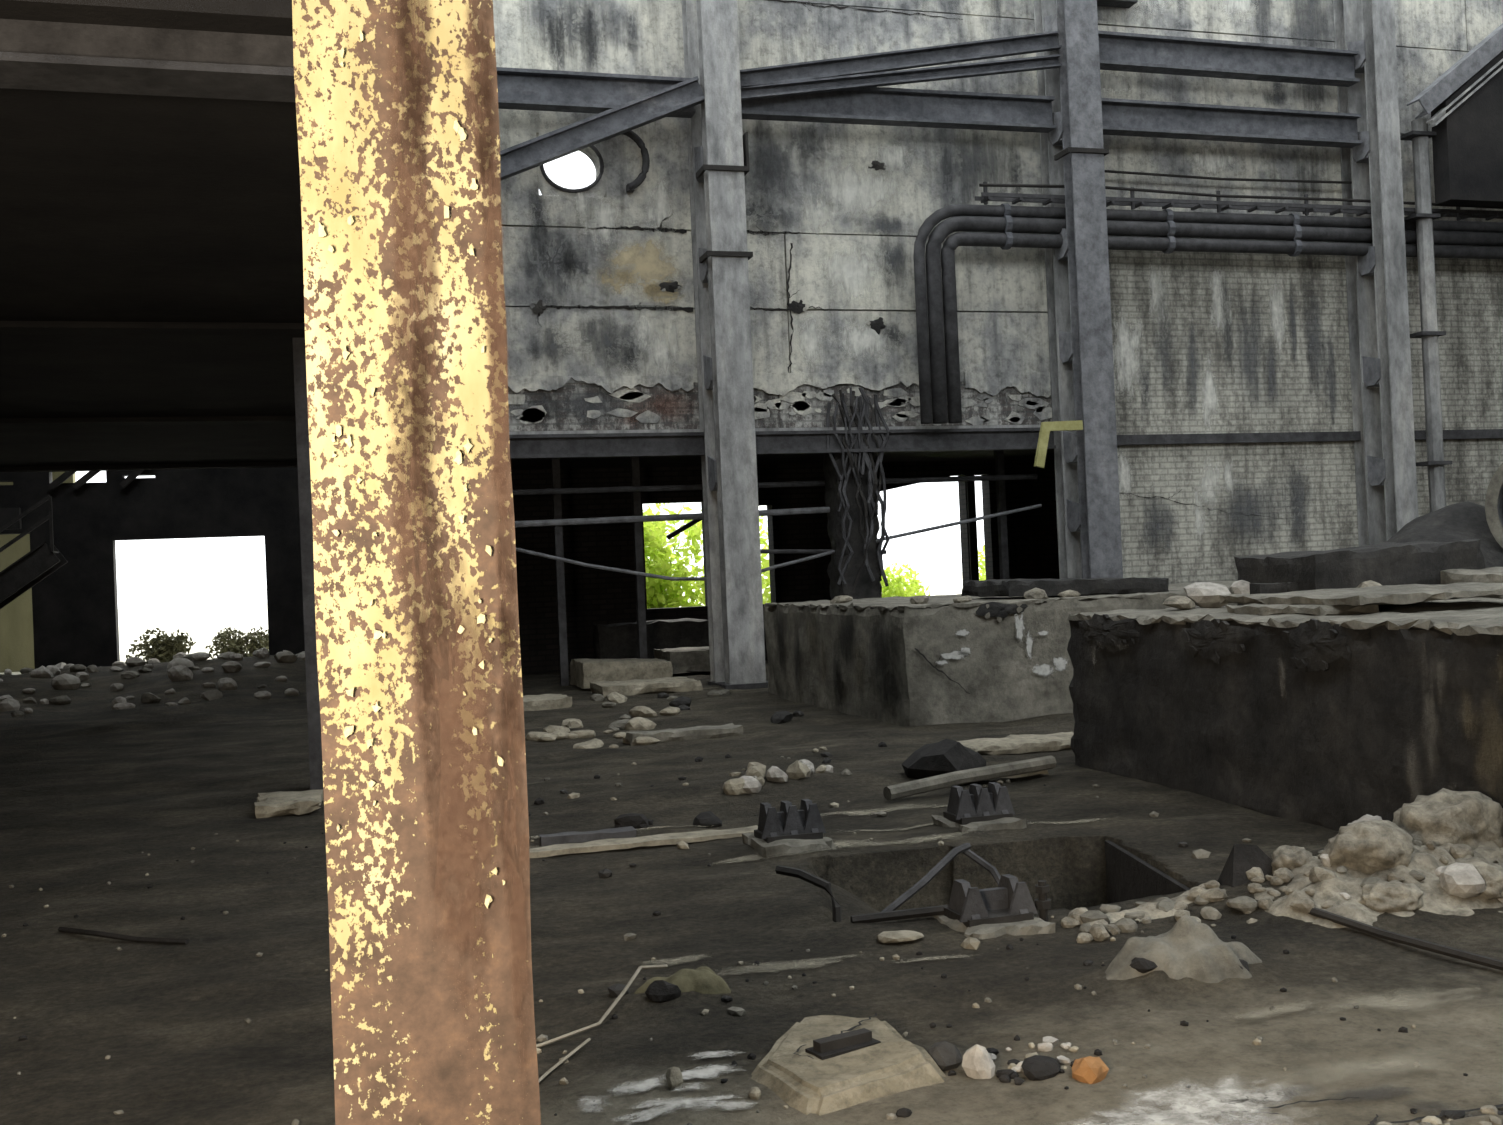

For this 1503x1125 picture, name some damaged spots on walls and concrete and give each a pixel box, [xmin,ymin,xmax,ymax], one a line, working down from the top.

damp [540,0,637,68]
damp [806,147,903,231]
damp [563,182,678,303]
flaking render [508,376,694,425]
flaking render [753,373,920,422]
damp [843,328,890,356]
damp [1113,272,1169,405]
damp [1188,330,1216,425]
damp [1211,274,1336,421]
rust [392,0,527,1012]
damp [1118,456,1130,493]
damp [1195,463,1305,540]